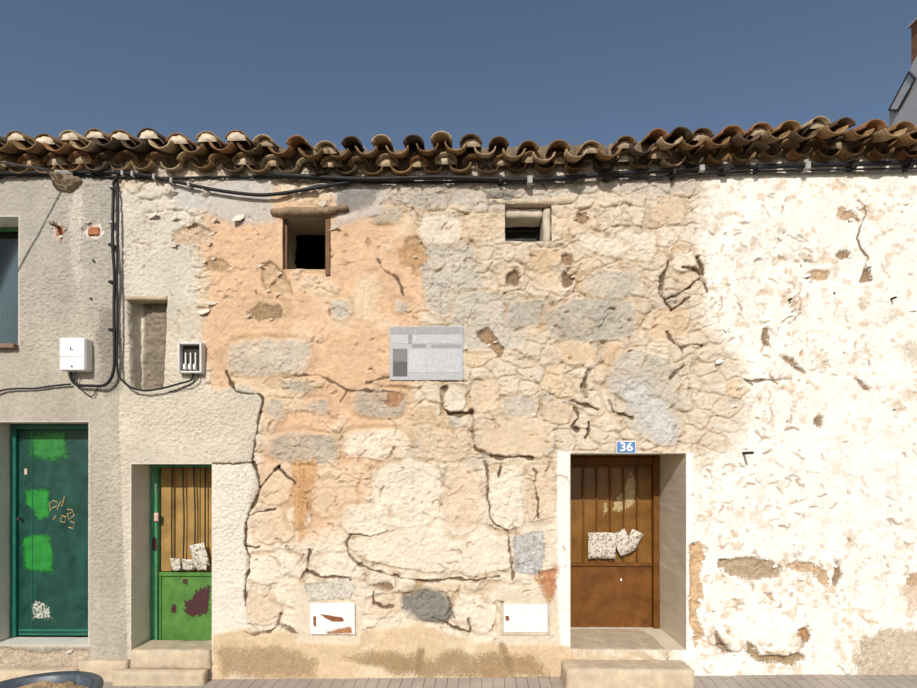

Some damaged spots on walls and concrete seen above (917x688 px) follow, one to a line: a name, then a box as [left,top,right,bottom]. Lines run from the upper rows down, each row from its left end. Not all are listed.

crack [659,257,708,380]
flaking render [477,327,504,358]
crack [289,374,393,403]
crack [212,370,296,607]
crack [306,385,539,632]
flaking render [716,556,843,587]
flaking render [688,538,735,656]
crack [253,612,299,636]
water stain [218,647,315,677]
water stain [350,643,543,678]
flaking render [747,642,806,665]
peeling [852,628,917,675]